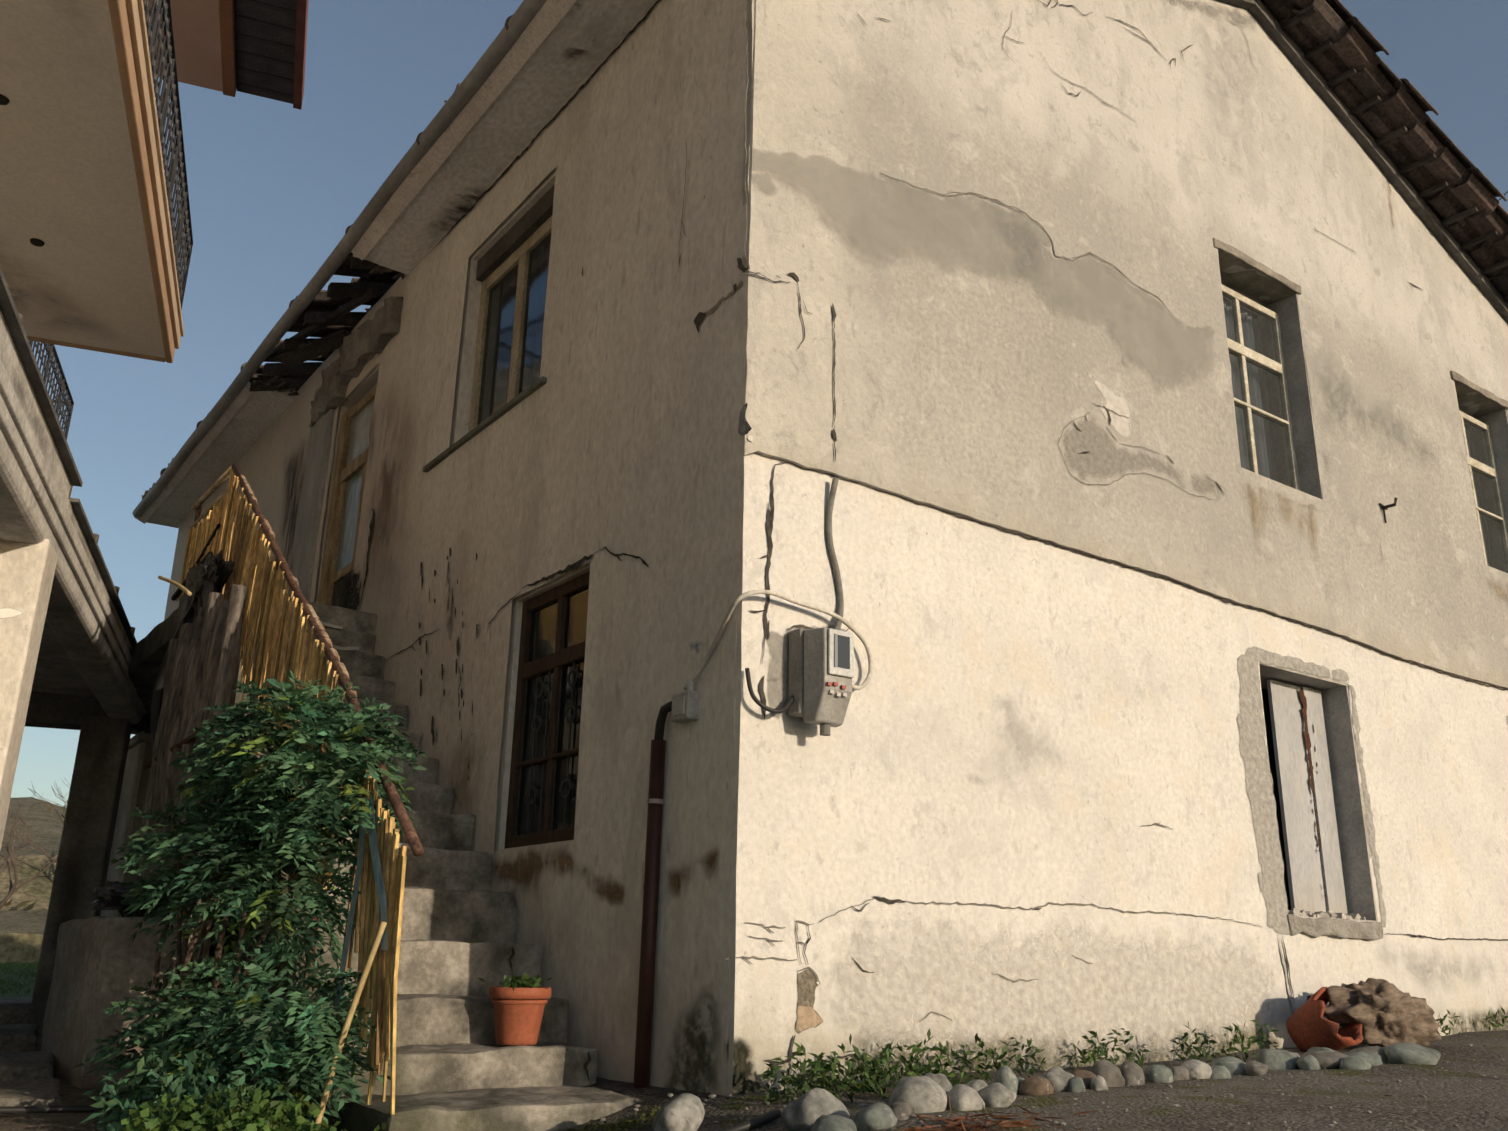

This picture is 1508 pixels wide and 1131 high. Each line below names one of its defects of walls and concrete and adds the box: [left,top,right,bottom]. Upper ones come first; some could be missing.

crack [425,0,660,257]
crack [678,143,705,272]
spalling [880,172,1171,313]
crack [741,0,1508,720]
spalling [1058,413,1228,501]
crack [488,547,649,628]
corrosion [1299,689,1326,897]
leakage [495,852,622,901]
spalling [795,967,823,1034]
crack [726,896,1261,965]
spalling [839,925,1269,1057]